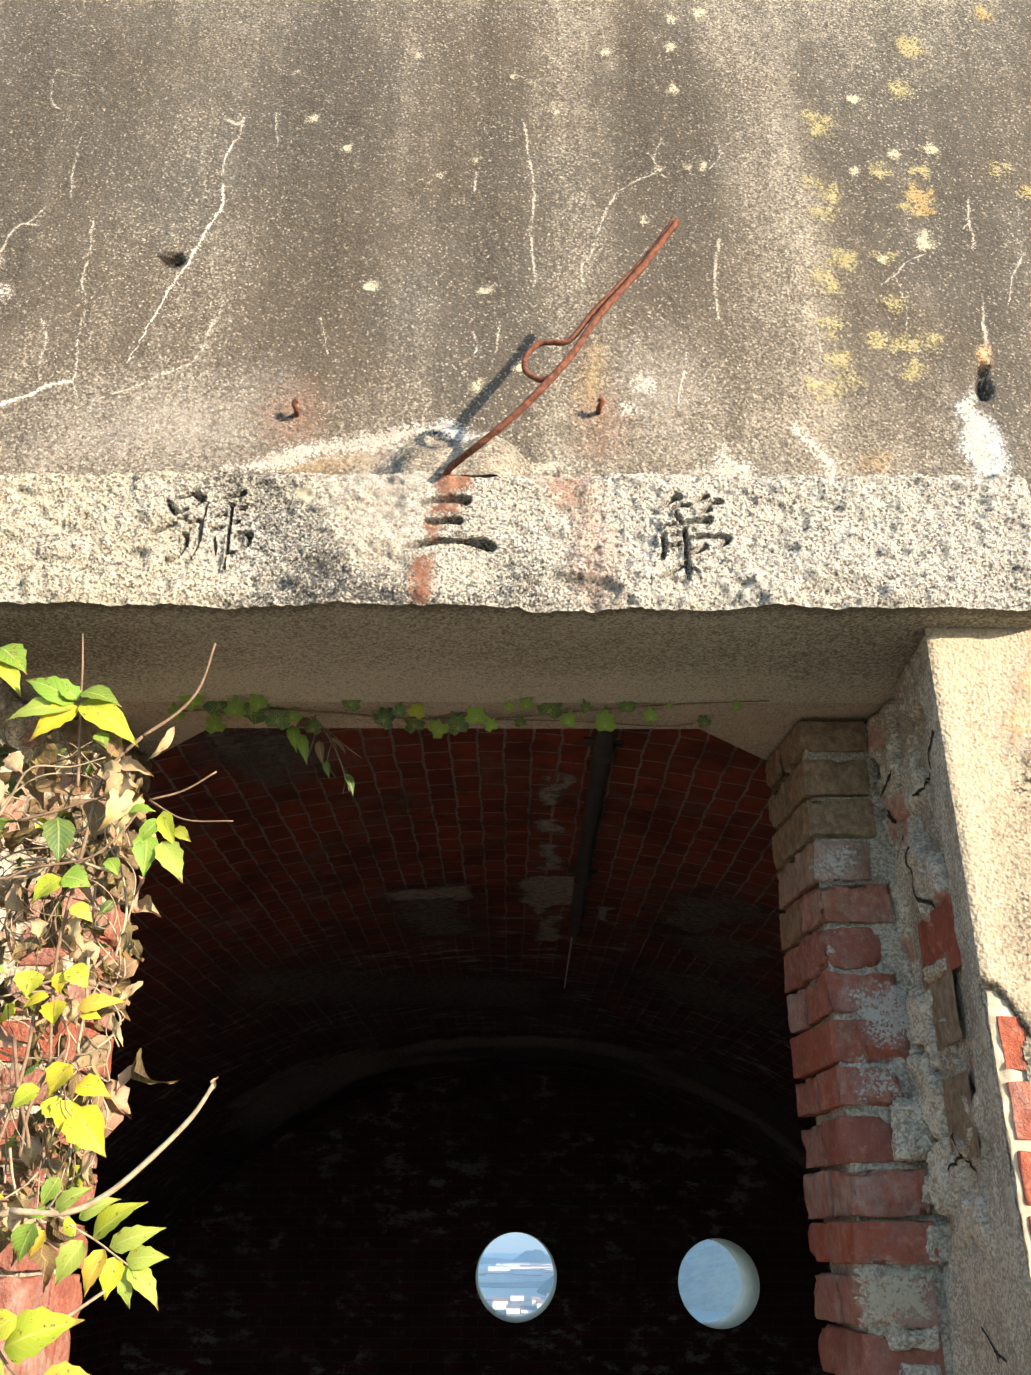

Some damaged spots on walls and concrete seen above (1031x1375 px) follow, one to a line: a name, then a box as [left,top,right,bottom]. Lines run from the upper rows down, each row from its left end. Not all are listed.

crack [0,115,279,412]
water stain [214,418,478,474]
water stain [532,462,577,473]
water stain [620,373,657,416]
water stain [689,445,757,476]
water stain [786,420,840,478]
water stain [953,389,1013,478]
corrosion [408,473,474,604]
crack [880,730,936,908]
spalling [918,895,962,1051]
spalling [942,1070,980,1159]
flaking render [977,975,1031,1276]